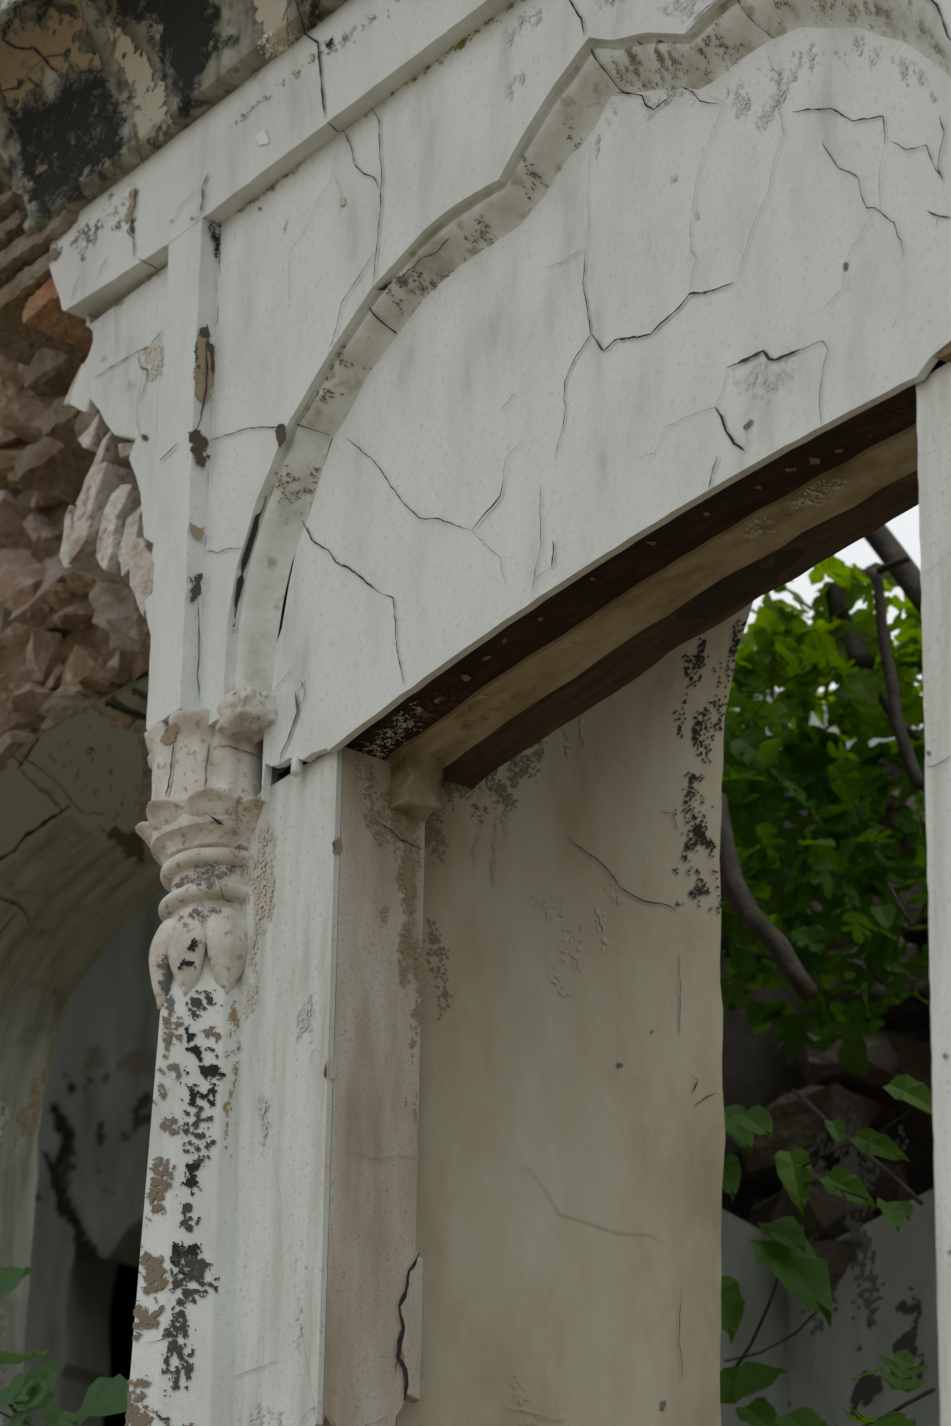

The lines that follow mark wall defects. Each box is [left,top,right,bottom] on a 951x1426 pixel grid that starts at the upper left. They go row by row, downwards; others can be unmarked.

crack [931,0,951,41]
damp [0,0,235,263]
crack [71,122,221,300]
crack [288,0,450,351]
crack [546,0,944,490]
crack [95,310,554,584]
crack [197,496,267,699]
crack [302,520,404,684]
crack [0,806,70,861]
crack [568,837,679,914]
mould [672,619,746,914]
crack [365,1253,420,1426]